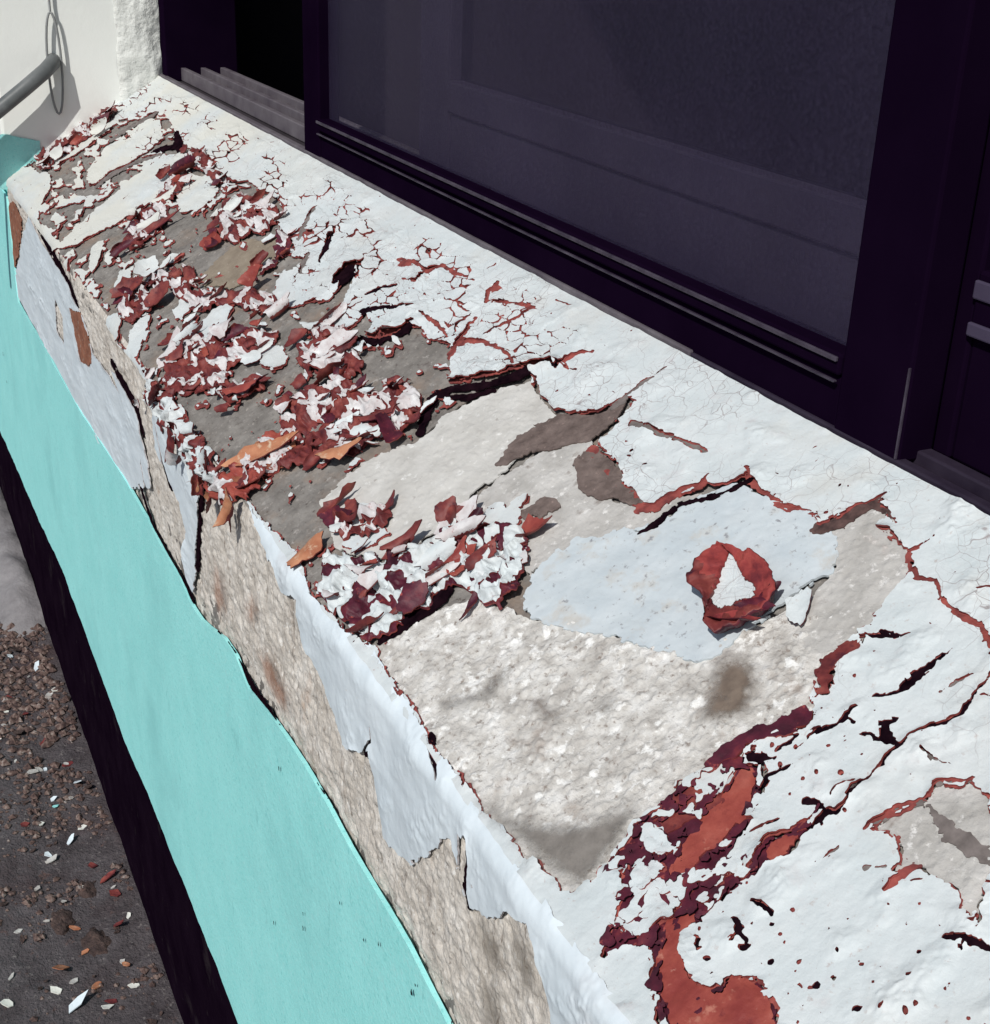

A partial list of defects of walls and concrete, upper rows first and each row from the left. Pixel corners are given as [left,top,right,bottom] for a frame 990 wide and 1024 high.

peeling [31,101,174,242]
crack [296,205,593,437]
crack [610,367,707,453]
crack [586,445,895,535]
flaking render [7,143,909,1024]
crack [865,630,908,639]
crack [905,547,990,643]
water stain [707,661,751,714]
crack [742,652,990,866]
crack [863,862,923,891]
peeling [878,783,990,916]